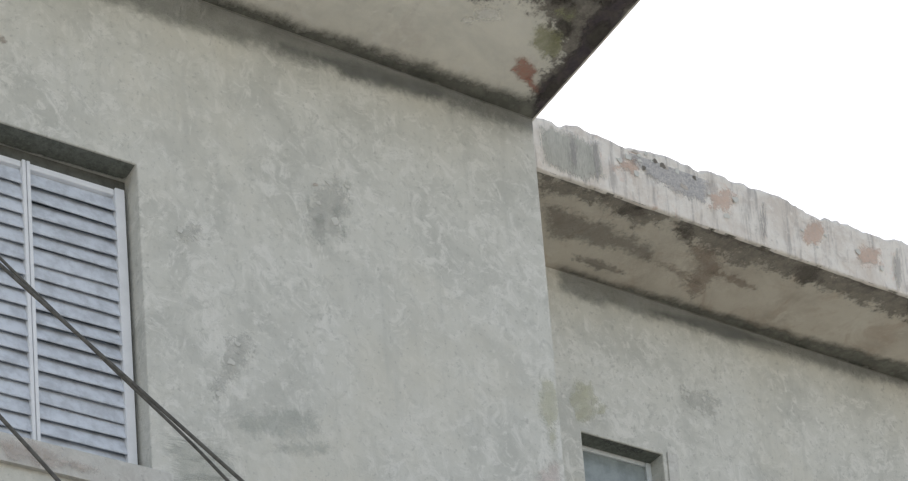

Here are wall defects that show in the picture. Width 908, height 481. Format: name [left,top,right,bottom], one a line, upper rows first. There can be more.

leakage [202,0,637,119]
rust [511,59,537,91]
spalling [616,150,739,218]
leakage [537,126,908,322]
peeling [801,222,827,248]
leakage [562,270,908,381]
leakage [581,433,660,464]